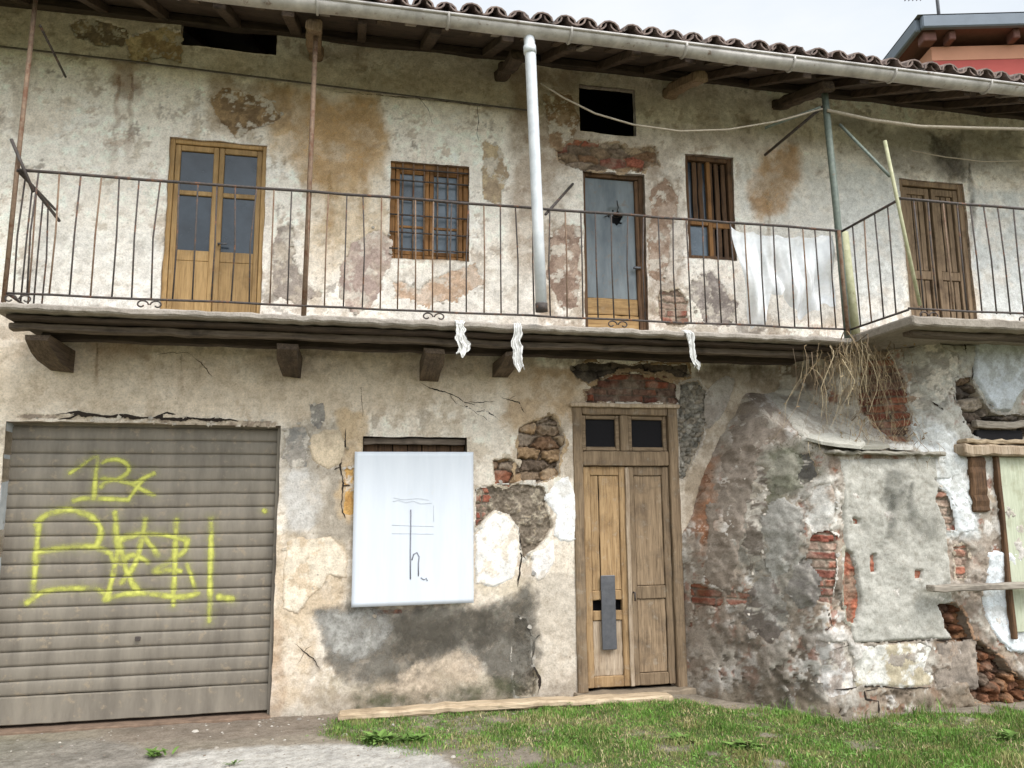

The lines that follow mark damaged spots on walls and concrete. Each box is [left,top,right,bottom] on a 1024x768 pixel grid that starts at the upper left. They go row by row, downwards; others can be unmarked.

flaking render [208,88,284,138]
flaking render [543,93,739,329]
crack [55,411,237,422]
crack [425,385,524,422]
flaking render [570,359,708,480]
flaking render [474,412,569,576]
flaking render [689,466,790,643]
flaking render [797,453,859,626]
flaking render [935,479,972,581]
leakage [315,584,541,699]
flaking render [816,641,856,697]
flaking render [933,601,1024,705]